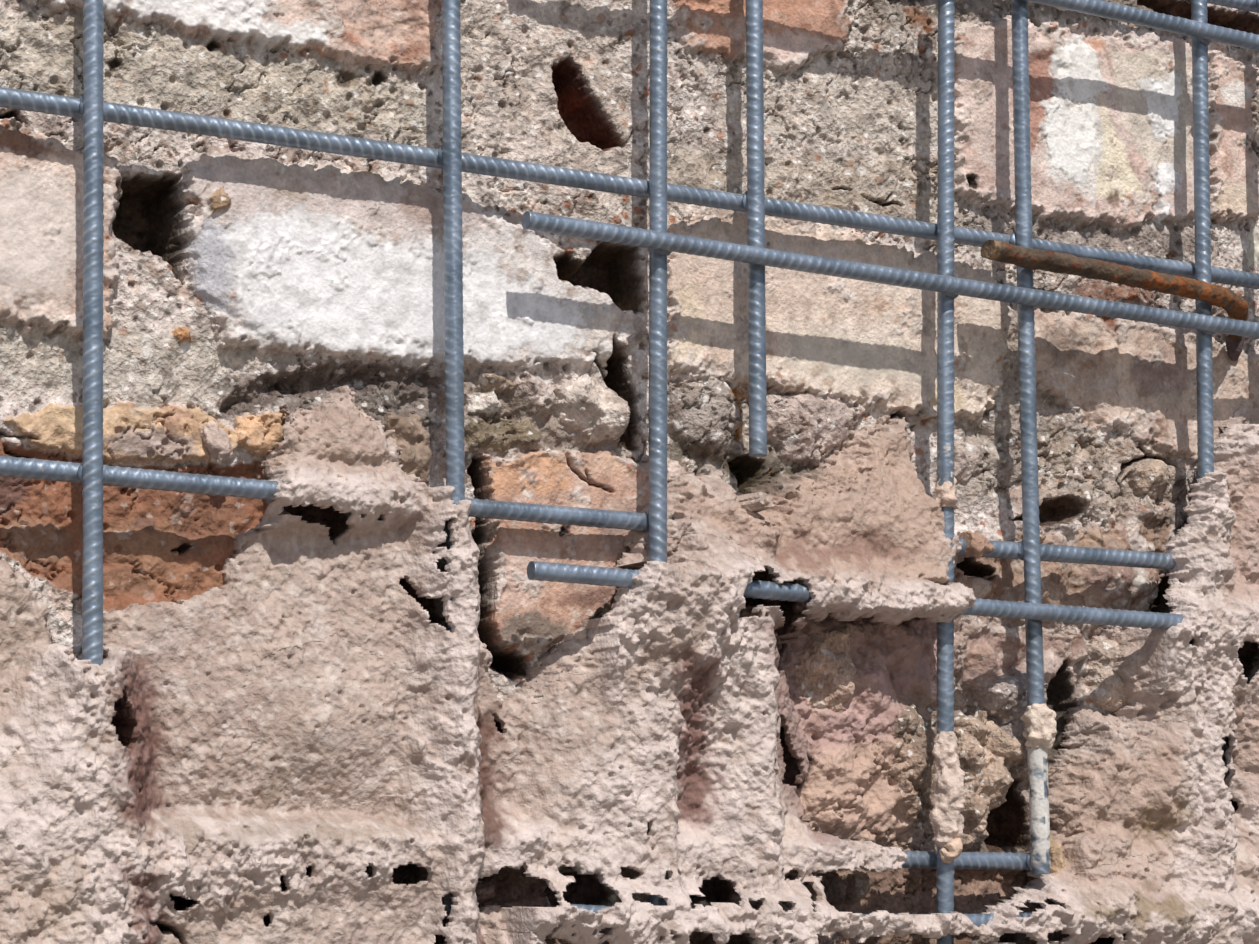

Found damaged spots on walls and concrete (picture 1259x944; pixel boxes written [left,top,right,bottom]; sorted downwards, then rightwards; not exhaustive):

peeling [103,0,437,69]
spalling [1137,0,1191,20]
spalling [1207,6,1259,35]
peeling [1028,35,1110,188]
peeling [0,170,83,310]
peeling [218,206,445,422]
peeling [462,248,594,362]
spalling [0,437,83,463]
spalling [103,458,268,480]
crack [1118,449,1160,496]
spalling [0,476,83,598]
spalling [103,485,270,612]